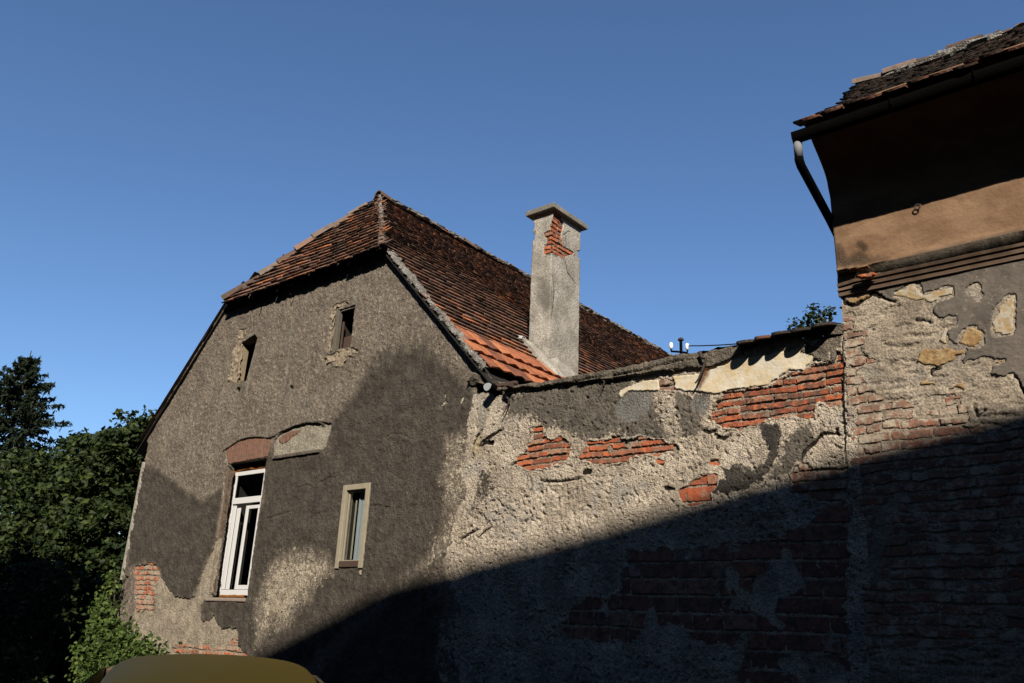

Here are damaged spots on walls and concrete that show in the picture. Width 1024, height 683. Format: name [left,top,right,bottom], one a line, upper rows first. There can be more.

spalling [542,212,575,260]
spalling [227,329,246,383]
spalling [324,302,358,368]
spalling [515,424,682,472]
spalling [561,259,1024,683]
spalling [127,464,341,656]